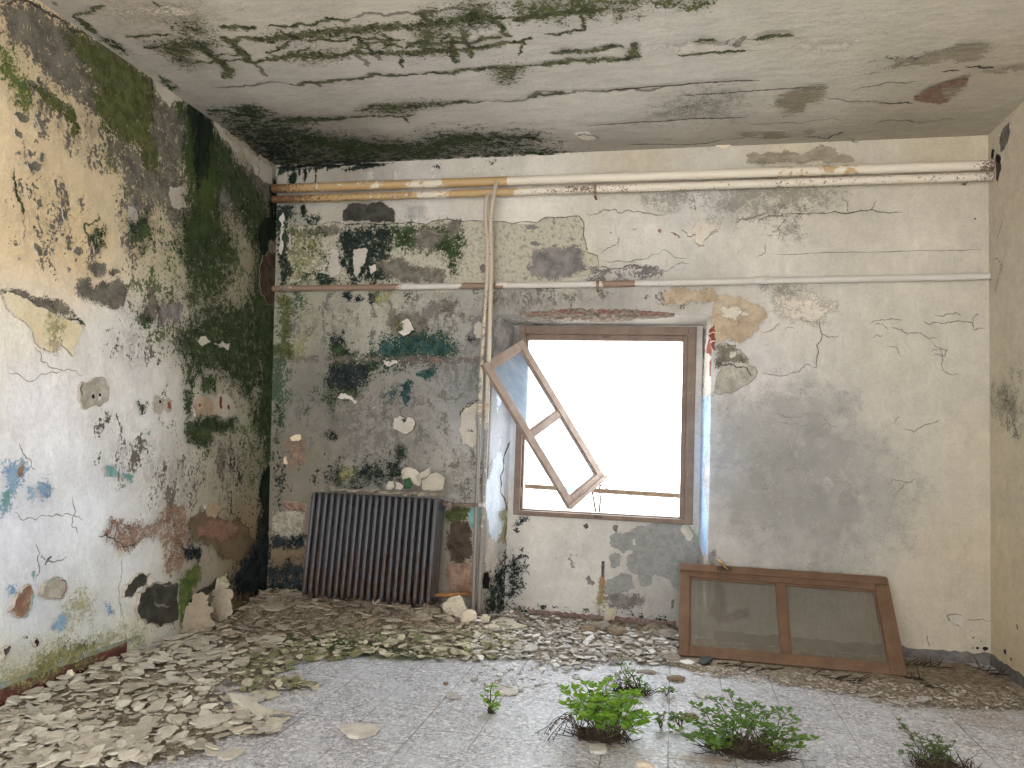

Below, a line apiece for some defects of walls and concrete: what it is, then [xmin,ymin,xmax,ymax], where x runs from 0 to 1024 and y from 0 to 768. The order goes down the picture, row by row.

crack [52,1,960,174]
damp [89,223,109,254]
crack [758,197,1003,262]
peeling [0,245,129,357]
damp [121,103,590,617]
peeling [258,201,768,397]
crack [762,292,838,377]
crack [871,312,983,375]
crack [15,504,82,578]
flaking render [99,501,255,628]
flaking render [444,507,491,599]
flaking render [586,523,717,610]